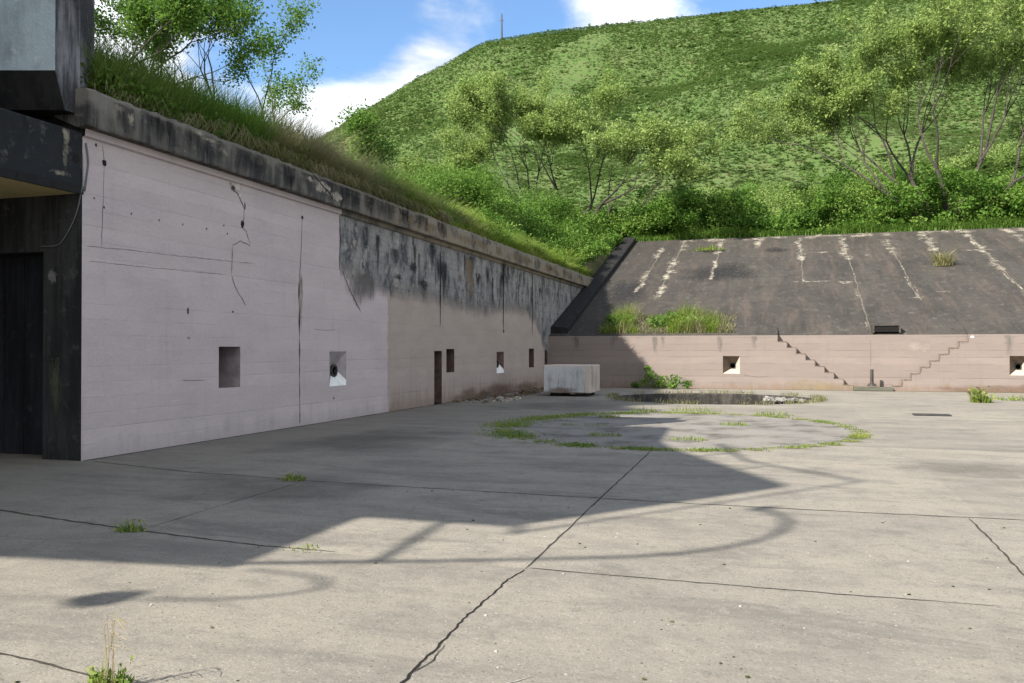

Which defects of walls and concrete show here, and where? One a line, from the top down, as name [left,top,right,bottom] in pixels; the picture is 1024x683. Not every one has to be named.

crack [231,186,250,306]
leakage [326,181,374,209]
crack [296,235,304,399]
crack [400,570,524,683]